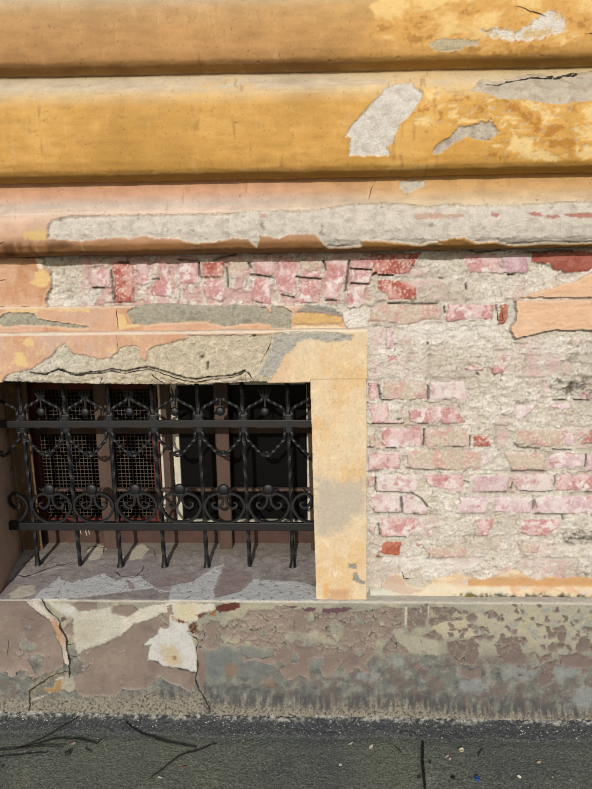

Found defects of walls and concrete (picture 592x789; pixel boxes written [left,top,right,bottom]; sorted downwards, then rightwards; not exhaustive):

peeling [369,0,592,57]
peeling [346,70,592,162]
spalling [399,179,425,192]
crack [38,338,272,384]
spalling [0,200,592,704]
crack [28,600,78,711]
crack [173,631,211,713]